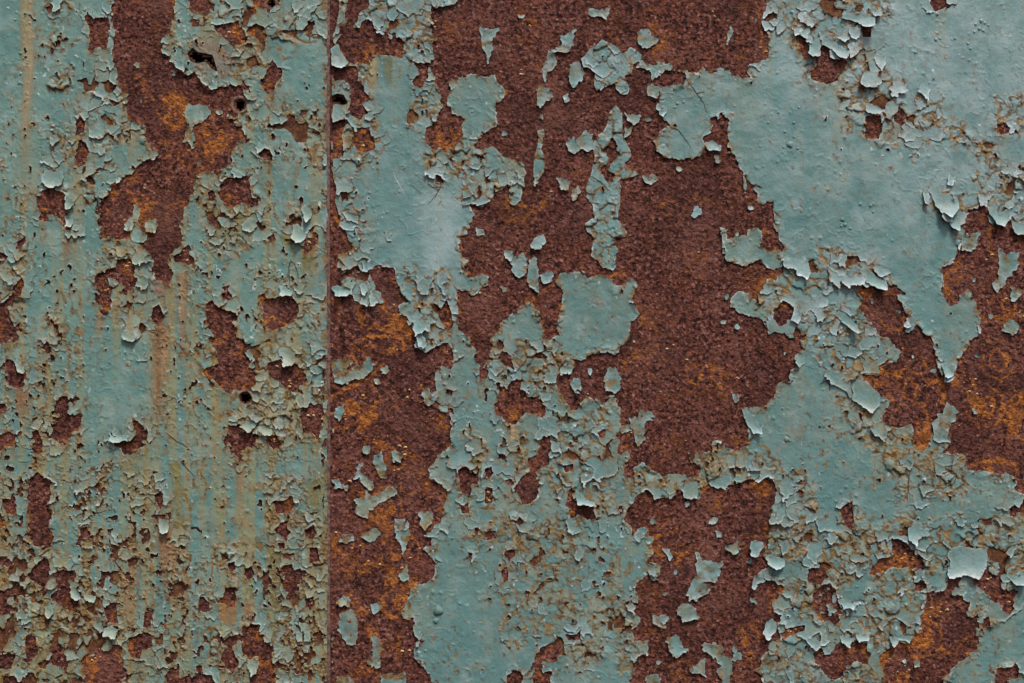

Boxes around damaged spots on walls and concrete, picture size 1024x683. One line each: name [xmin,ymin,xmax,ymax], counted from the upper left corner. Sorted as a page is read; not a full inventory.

peeling [203,0,394,294]
peeling [762,0,1024,231]
rust [0,0,284,616]
peeling [228,327,327,447]
rust [199,0,805,683]
peeling [760,250,893,442]
rust [858,205,1024,527]
peeling [0,528,141,683]
peeling [507,400,638,671]
peeling [667,445,1024,683]
rust [835,500,864,530]
rust [798,532,1024,683]